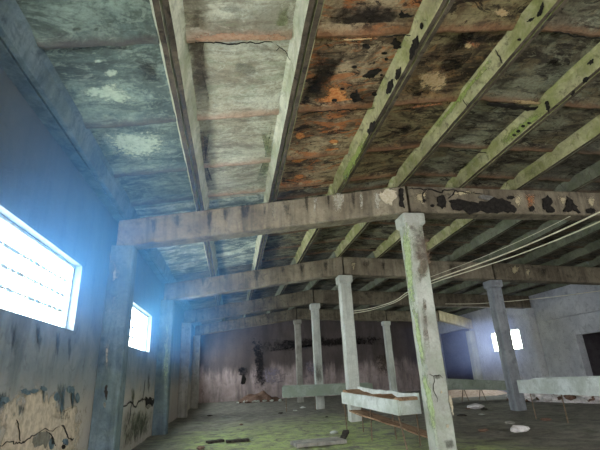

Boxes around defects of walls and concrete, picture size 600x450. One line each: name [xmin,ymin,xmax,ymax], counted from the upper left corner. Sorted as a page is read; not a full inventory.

peeling [382,22,423,60]
efflorescence [84,70,131,102]
corrosion [321,87,363,111]
leakage [105,131,162,157]
spalling [379,188,405,208]
crack [407,188,481,203]
peeling [424,194,517,215]
peeling [563,196,596,214]
leakage [416,230,431,276]
leakage [254,341,279,385]
crack [123,384,153,424]
crack [0,420,74,446]